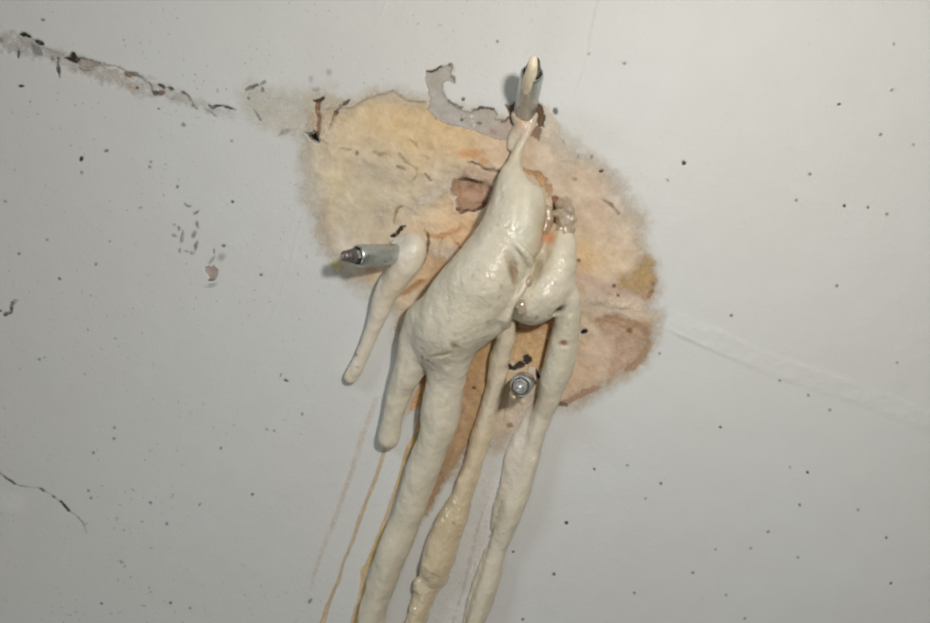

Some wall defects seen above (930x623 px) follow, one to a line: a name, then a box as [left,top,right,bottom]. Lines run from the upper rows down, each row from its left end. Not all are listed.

crack [0,33,233,109]
peeling [426,64,515,140]
water stain [301,93,660,406]
water stain [489,320,543,448]